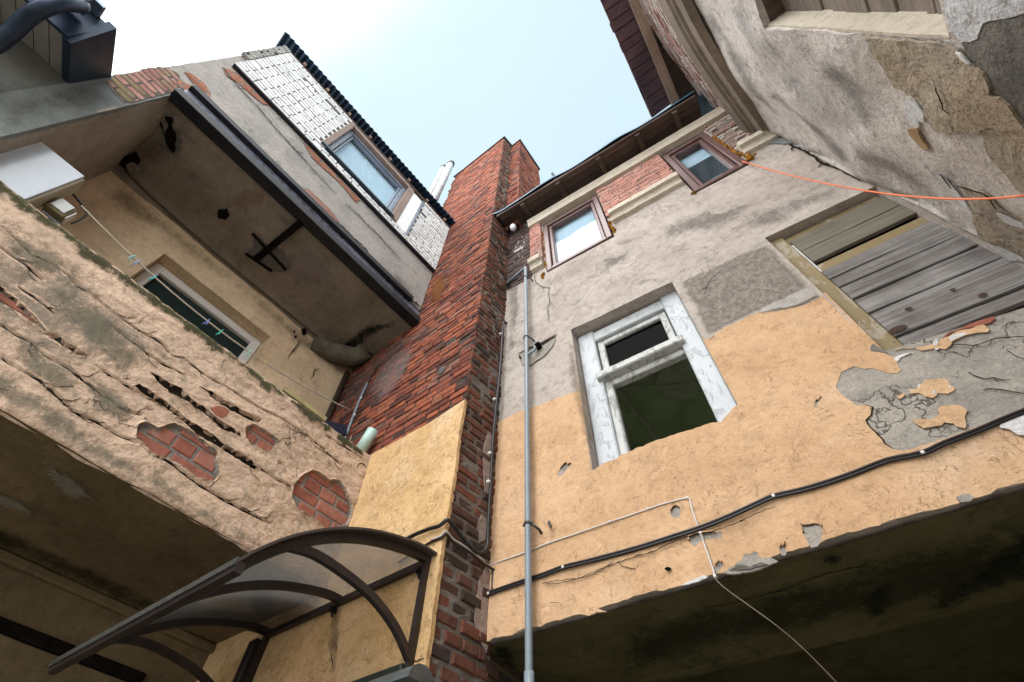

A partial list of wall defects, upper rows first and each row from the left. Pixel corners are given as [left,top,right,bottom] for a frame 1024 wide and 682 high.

flaking render [106,67,211,103]
flaking render [222,67,270,106]
flaking render [864,0,1024,193]
crack [784,138,860,181]
flaking render [934,174,1024,263]
crack [4,235,360,470]
peeling [836,308,1024,450]
crack [1,325,273,523]
flaking render [132,369,279,483]
flaking render [291,468,354,528]
flaking render [679,540,787,587]
peeling [800,522,823,548]